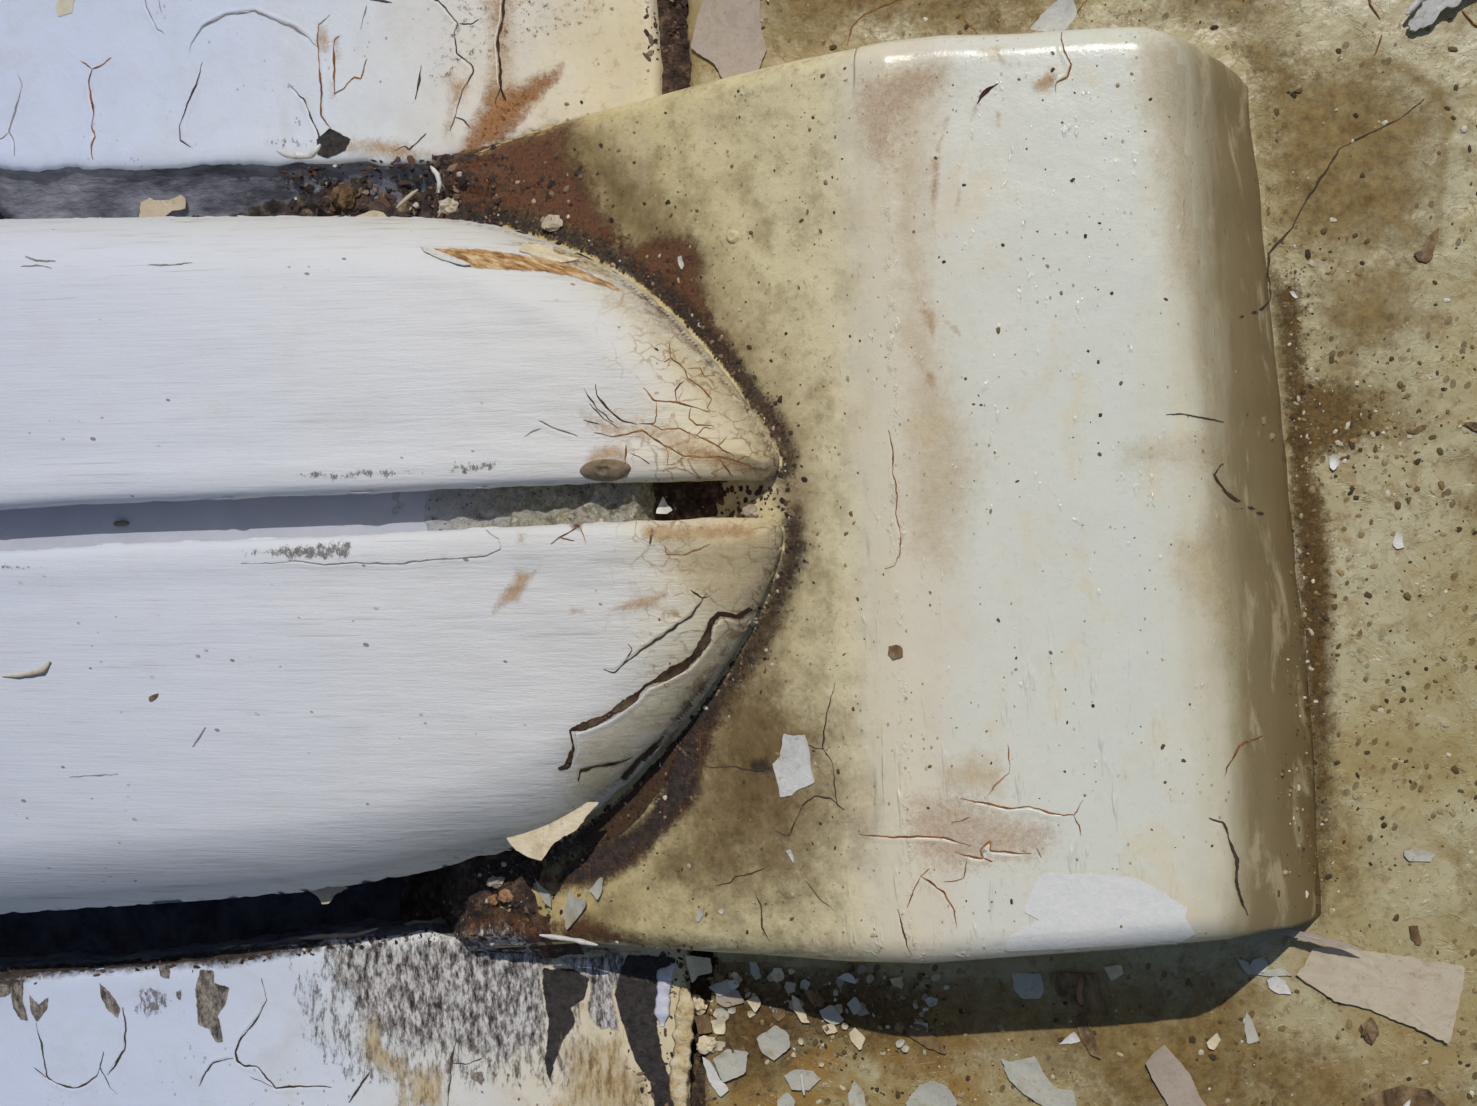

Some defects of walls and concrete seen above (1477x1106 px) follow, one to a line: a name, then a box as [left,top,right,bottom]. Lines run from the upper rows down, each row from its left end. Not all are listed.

crack [140,0,392,156]
spalling [317,128,351,158]
crack [391,0,506,153]
corrosion [434,0,745,385]
crack [527,342,756,477]
crack [558,528,766,781]
crack [716,684,1081,957]
peeling [0,979,48,1021]
peeling [99,964,229,1043]
peeling [295,921,674,1106]
peeling [1006,873,1195,951]
peeling [1236,928,1465,1044]